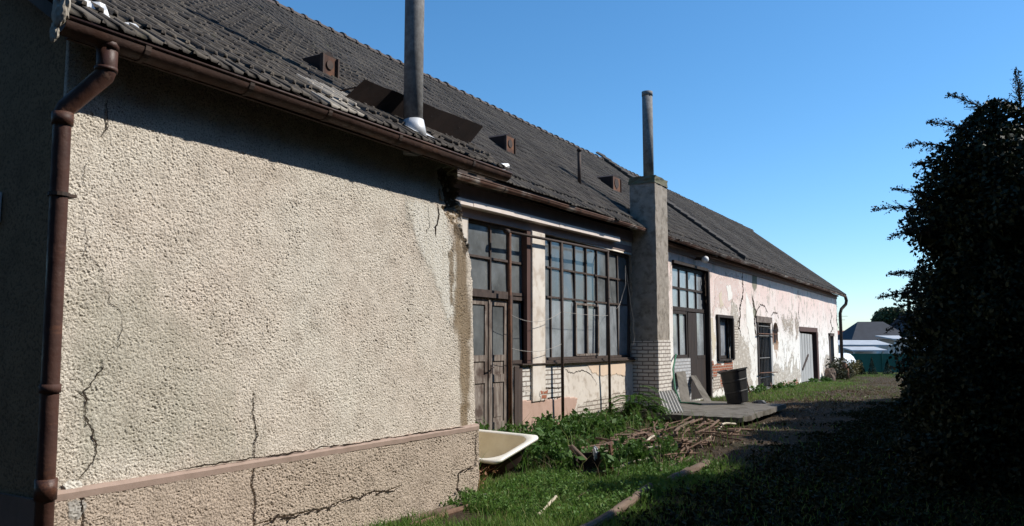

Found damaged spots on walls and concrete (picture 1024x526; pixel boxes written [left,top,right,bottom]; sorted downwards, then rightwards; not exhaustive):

crack [78,102,123,525]
damp [448,237,471,426]
peeling [522,364,626,431]
peeling [587,361,626,376]
peeling [711,273,755,393]
crack [738,272,799,335]
peeling [771,313,801,386]
crack [166,399,477,524]